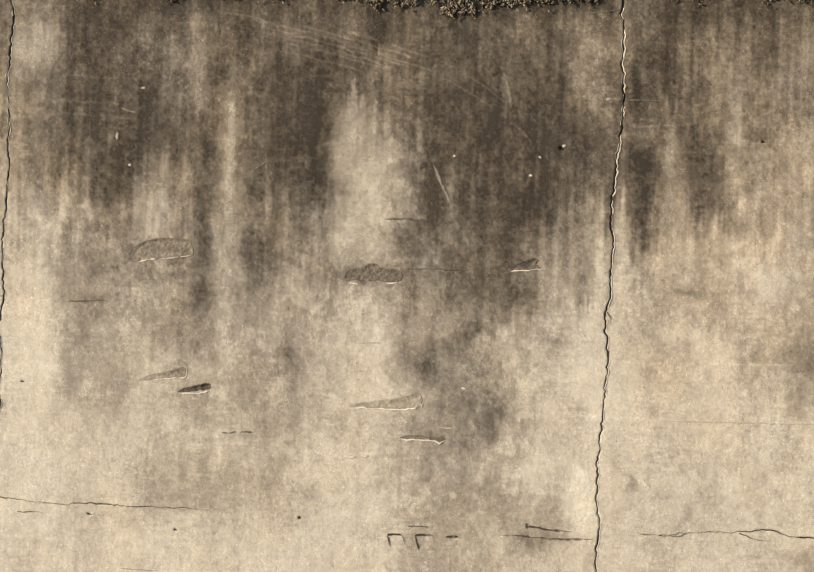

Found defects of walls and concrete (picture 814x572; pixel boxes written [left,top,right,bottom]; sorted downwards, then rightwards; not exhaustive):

crack [0,0,16,409]
damp [63,80,178,200]
spalling [130,238,193,262]
damp [245,39,339,201]
spalling [345,263,402,284]
damp [412,18,565,301]
crack [504,0,627,572]
damp [629,143,659,239]
spalling [139,368,210,394]
spalling [349,393,423,410]
crack [0,496,203,512]
crack [640,529,814,541]